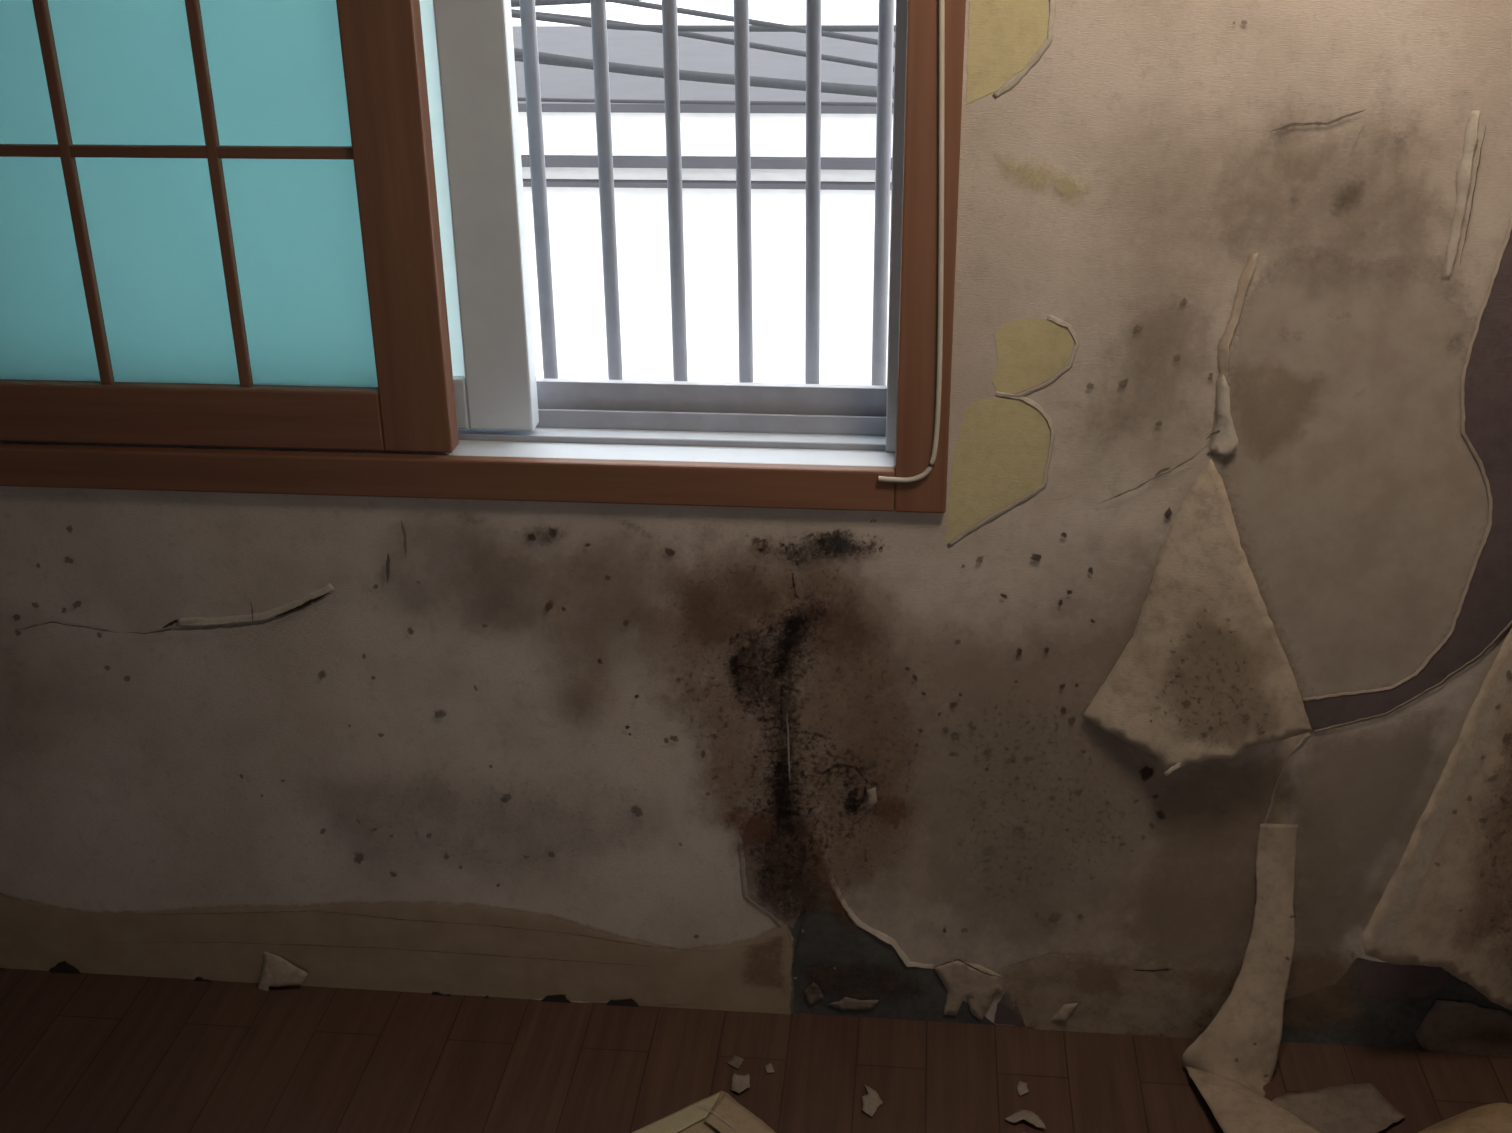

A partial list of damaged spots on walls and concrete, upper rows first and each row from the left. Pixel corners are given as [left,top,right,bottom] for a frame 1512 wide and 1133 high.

peeling [967,0,1056,104]
leakage [1269,110,1366,151]
peeling [945,314,1080,548]
crack [17,583,334,634]
peeling [1082,217,1512,1133]
leakage [0,519,1257,1014]
peeling [737,808,995,1025]
peeling [257,951,309,991]
peeling [518,995,639,1007]
leakage [1004,953,1240,1039]